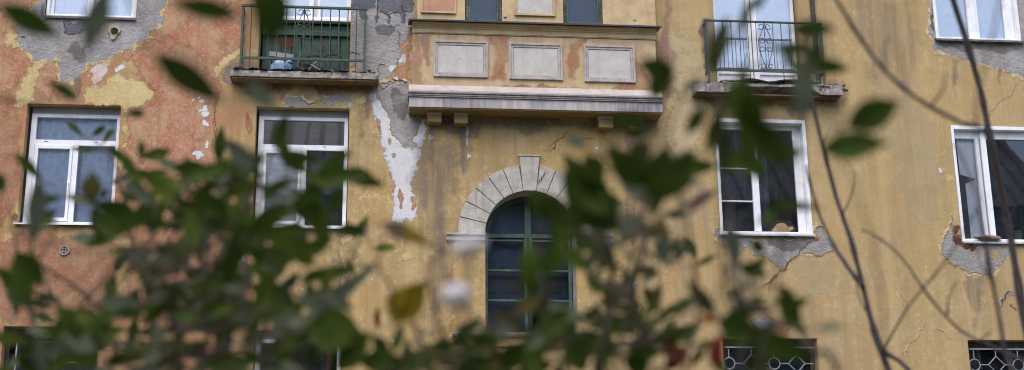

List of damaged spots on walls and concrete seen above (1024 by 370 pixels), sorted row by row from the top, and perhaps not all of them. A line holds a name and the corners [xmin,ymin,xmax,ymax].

flaking render [924,0,1024,81]
peeling [0,0,245,226]
flaking render [281,0,434,222]
flaking render [739,224,834,269]
crack [763,241,812,293]
flaking render [937,202,1010,277]